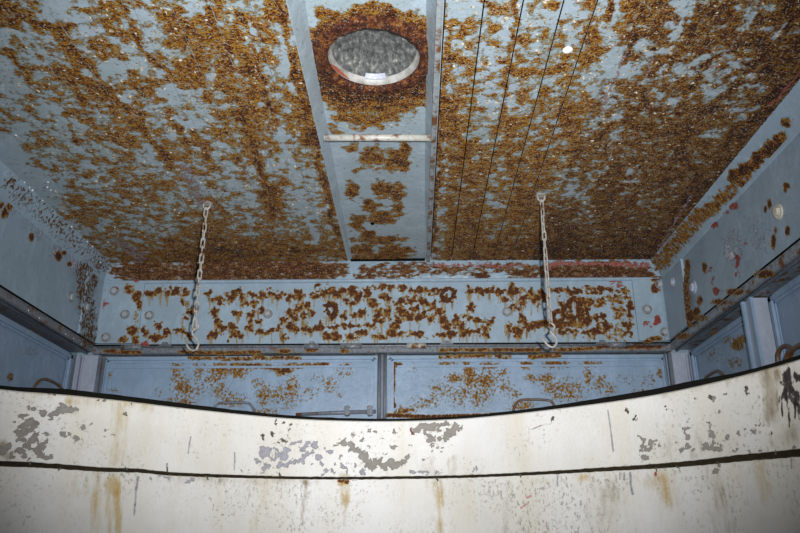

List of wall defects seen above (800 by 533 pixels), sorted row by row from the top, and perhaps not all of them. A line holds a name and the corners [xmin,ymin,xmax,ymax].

corrosion [0,0,800,418]
peeling [0,393,93,461]
peeling [241,419,463,476]
peeling [637,435,661,461]
peeling [675,418,762,453]